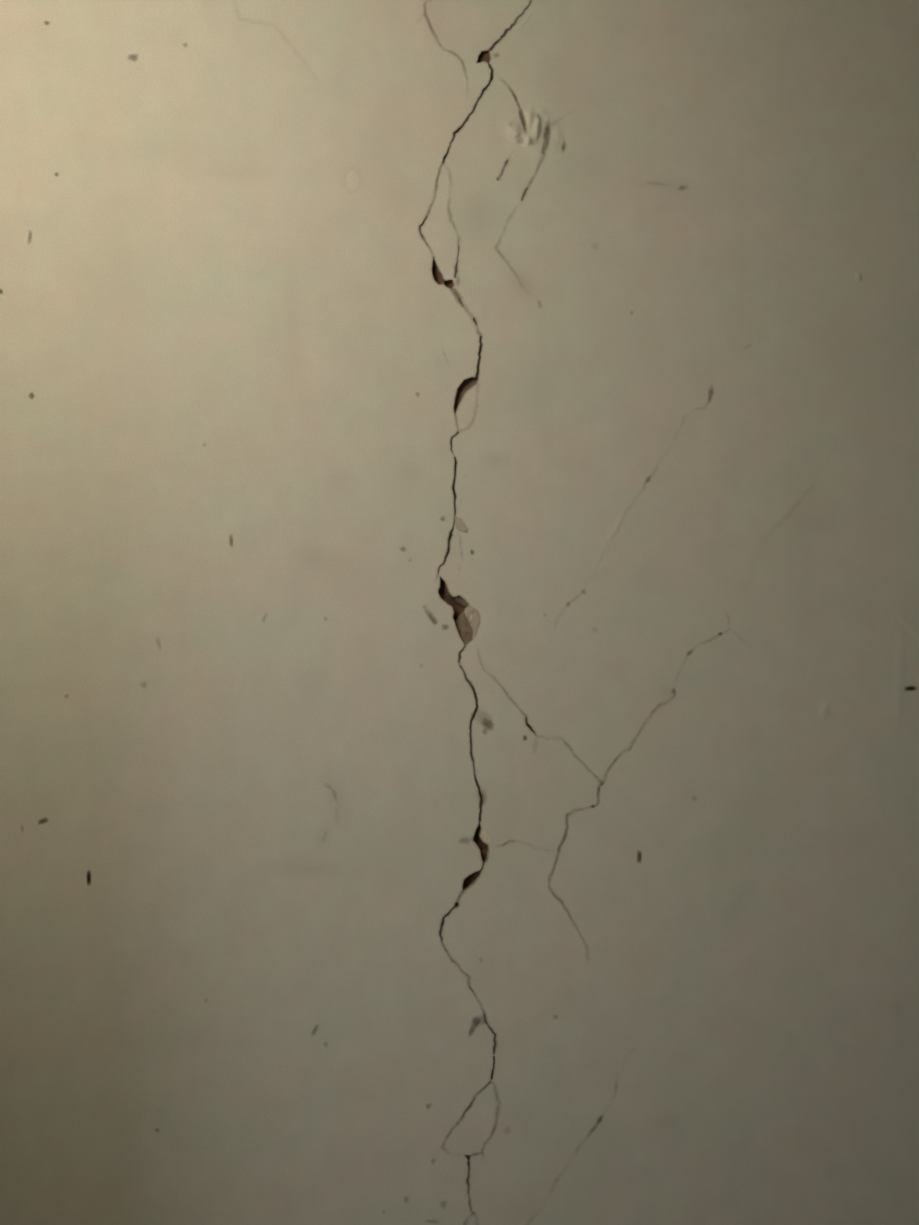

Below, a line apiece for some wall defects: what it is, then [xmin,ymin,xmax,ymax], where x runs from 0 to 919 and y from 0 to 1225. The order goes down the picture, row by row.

crack [443,1,535,163]
crack [454,245,482,378]
crack [438,432,459,573]
crack [458,646,483,822]
crack [440,891,463,941]
crack [462,1014,496,1118]